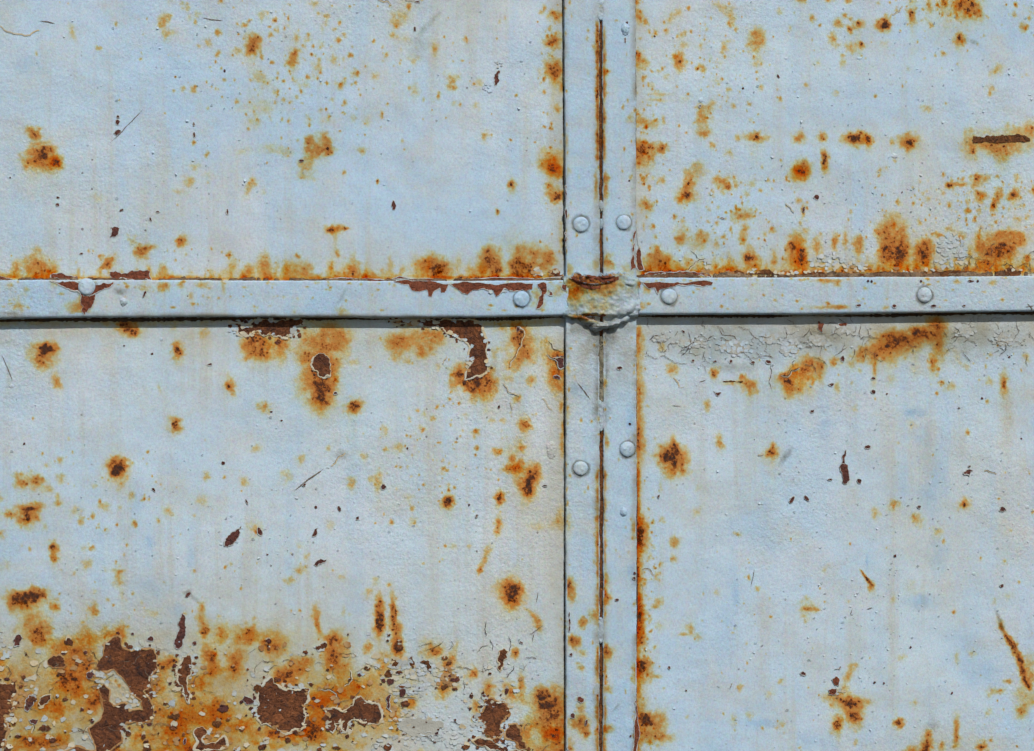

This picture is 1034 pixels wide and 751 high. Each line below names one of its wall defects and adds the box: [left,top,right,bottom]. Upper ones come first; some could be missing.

rust [883,227,929,269]
peeling [388,318,493,384]
rust [862,324,940,357]
rust [305,352,331,405]
rust [454,370,492,392]
crack [636,312,1034,467]
rust [376,600,400,653]
peeling [0,612,533,751]
rust [1004,635,1030,688]
rust [536,690,571,751]
rust [638,713,663,737]
rust [840,698,860,721]